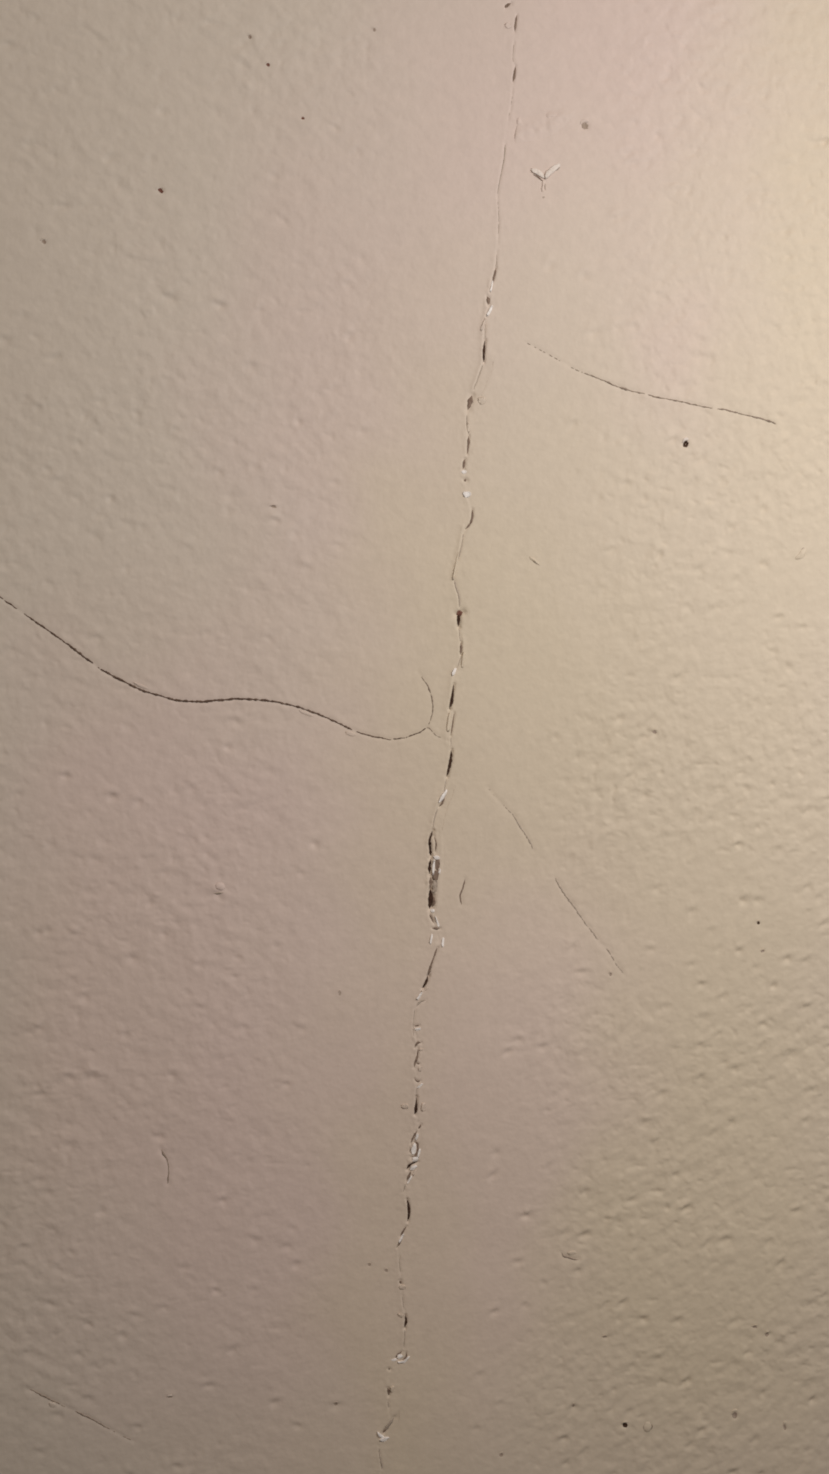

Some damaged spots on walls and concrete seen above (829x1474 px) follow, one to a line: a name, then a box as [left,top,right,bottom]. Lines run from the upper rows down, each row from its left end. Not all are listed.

crack [0,0,533,1474]
crack [527,343,776,424]